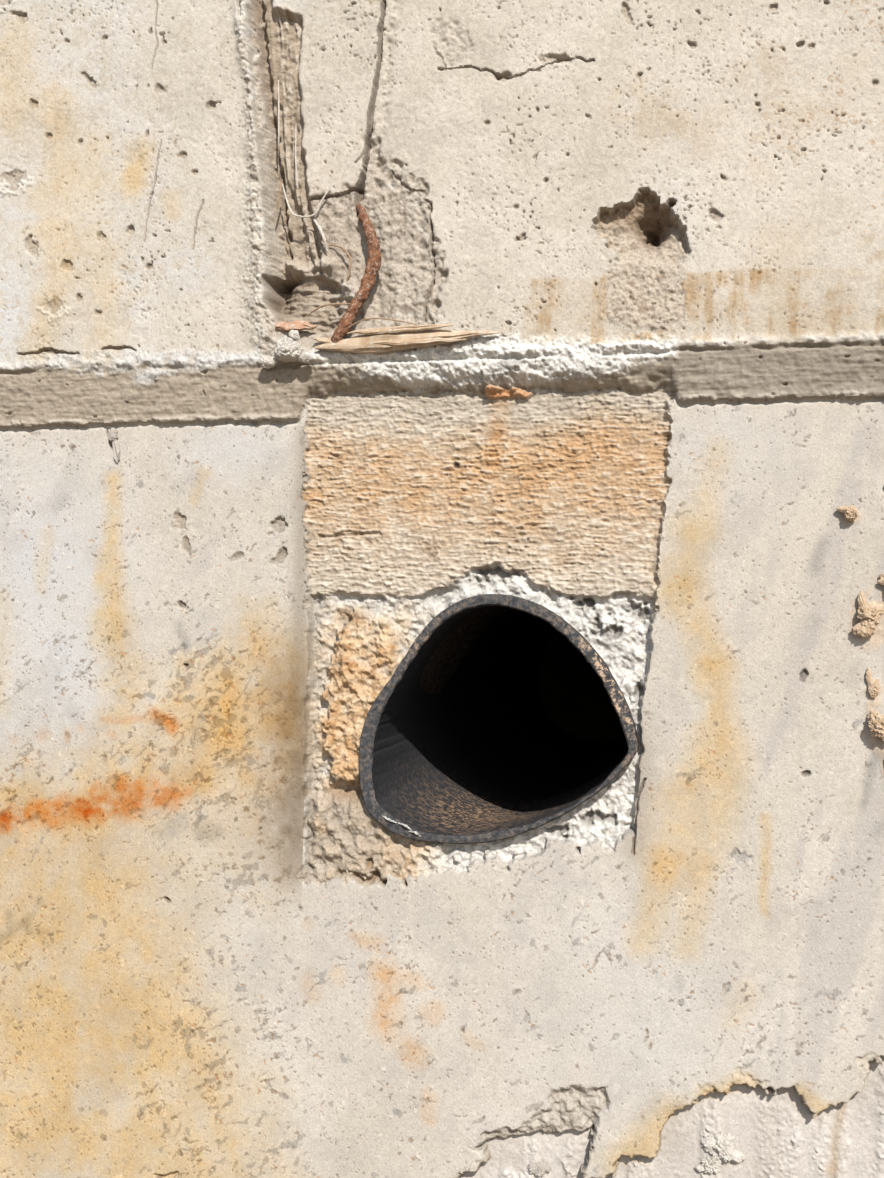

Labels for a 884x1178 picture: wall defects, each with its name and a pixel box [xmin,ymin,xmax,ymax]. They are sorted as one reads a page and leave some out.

crack [432,45,595,81]
spalling [234,0,449,360]
crack [309,0,437,323]
rust [331,203,382,343]
spalling [590,184,692,336]
spalling [295,564,655,888]
flaking render [135,1168,167,1178]
flaking render [434,1042,884,1178]